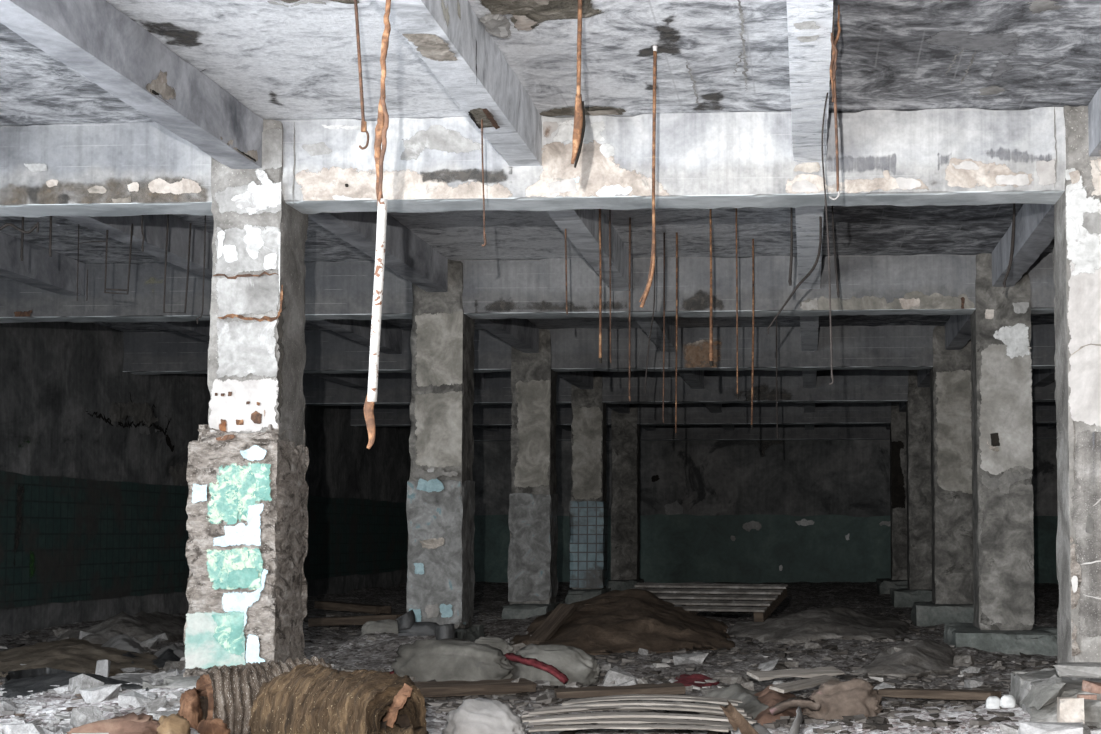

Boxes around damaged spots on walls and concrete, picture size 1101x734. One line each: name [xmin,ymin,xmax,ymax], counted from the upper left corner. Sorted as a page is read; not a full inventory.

peeling [295,106,669,201]
peeling [217,127,282,299]
peeling [945,158,1101,276]
corrosion [684,340,721,368]
corrosion [364,393,376,449]
peeling [108,400,278,669]